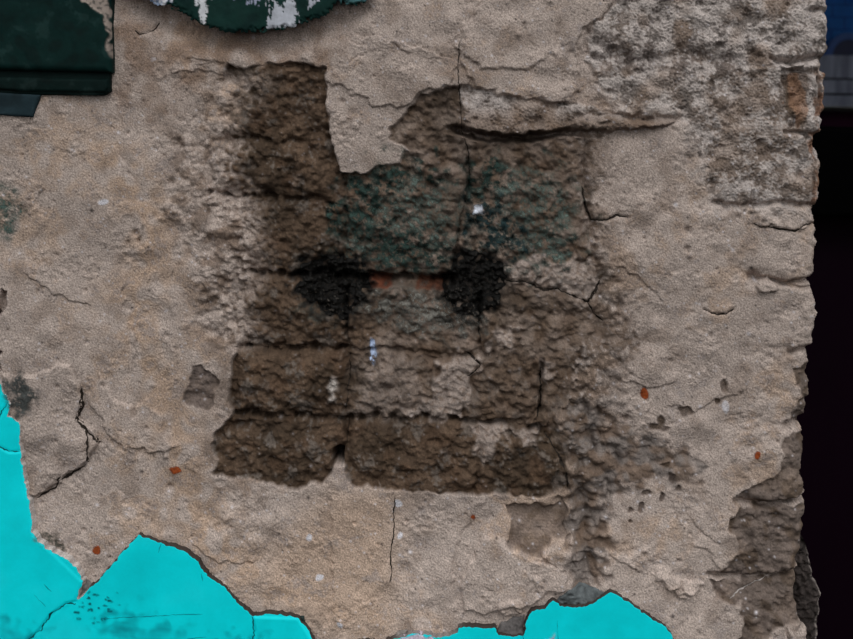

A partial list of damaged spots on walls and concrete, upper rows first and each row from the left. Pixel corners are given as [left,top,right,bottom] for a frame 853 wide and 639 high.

crack [581,187,628,221]
damp [353,287,487,339]
spalling [183,0,828,587]
crack [37,388,101,498]
peeling [0,377,316,639]
crack [389,499,397,581]
spalling [709,431,821,639]
peeling [386,589,674,639]